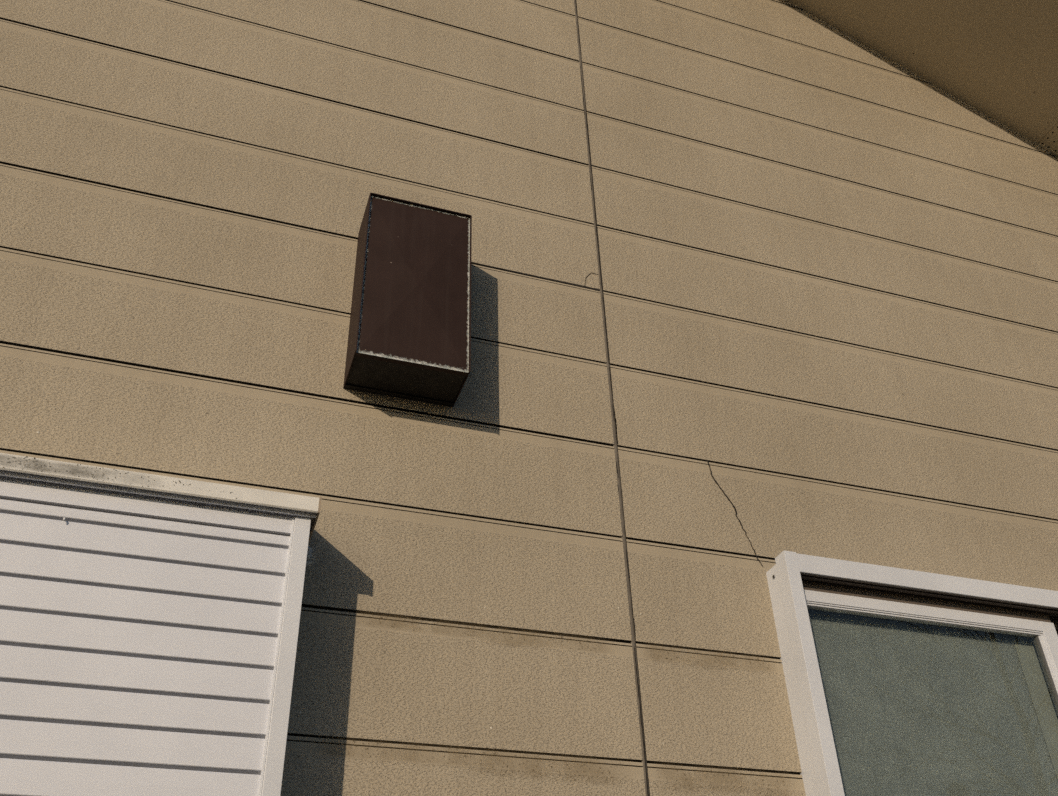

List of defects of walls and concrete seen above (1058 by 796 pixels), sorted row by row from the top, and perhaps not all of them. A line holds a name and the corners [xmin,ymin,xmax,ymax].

crack [707,460,763,567]